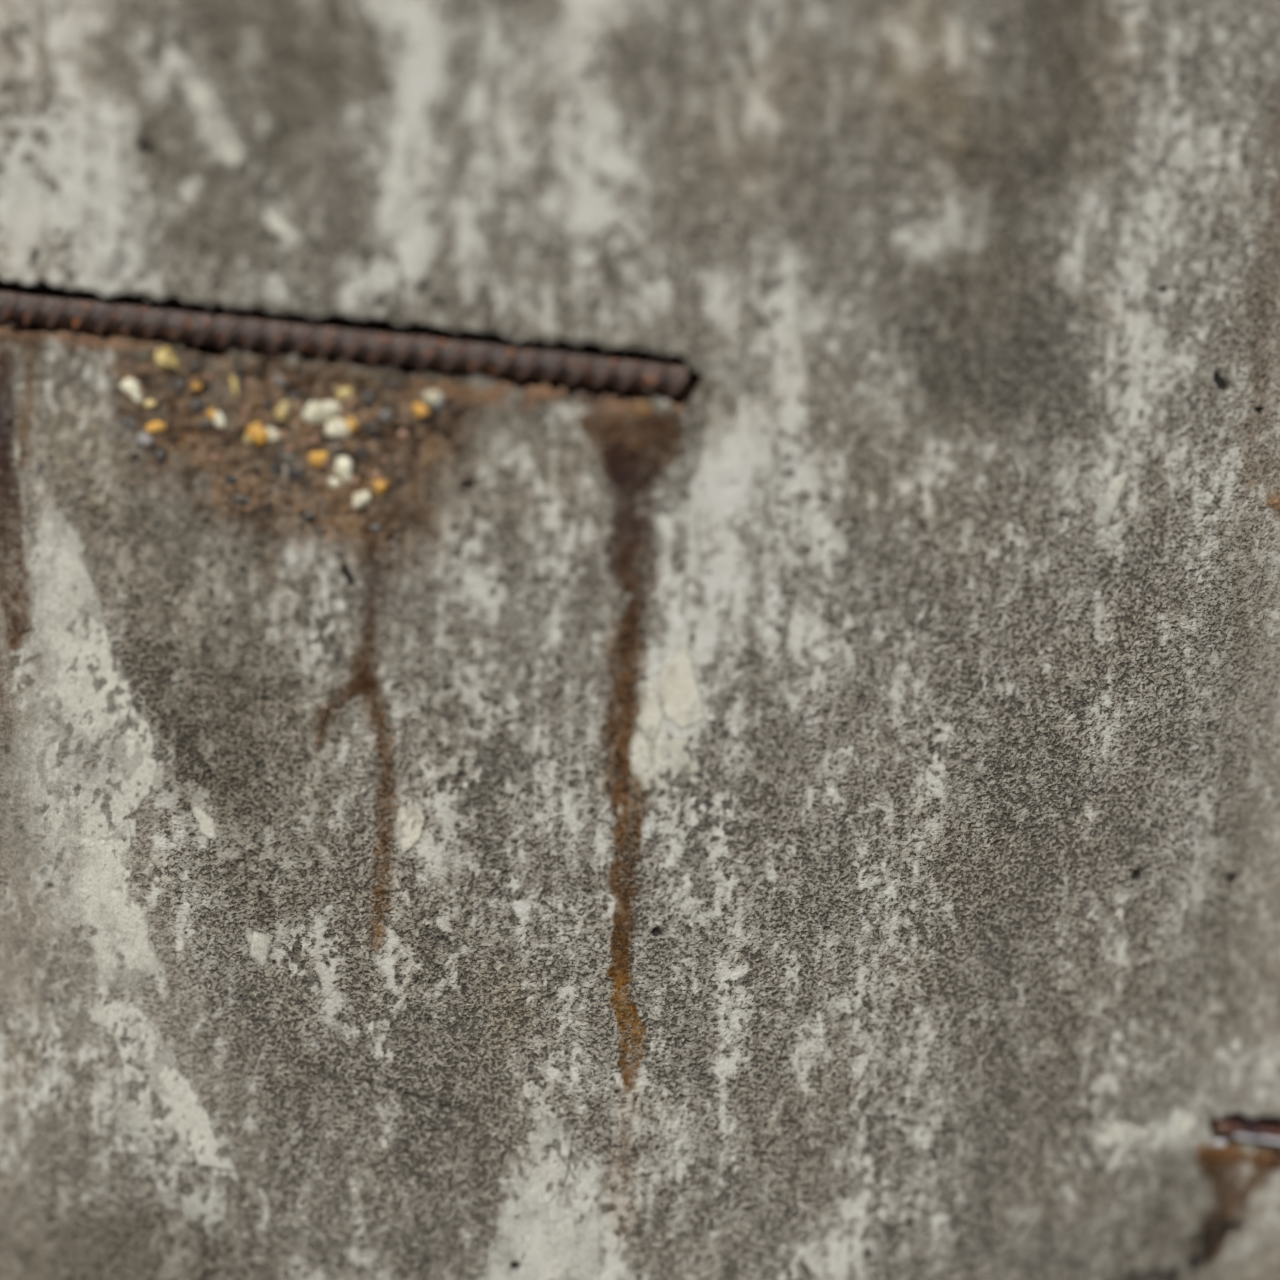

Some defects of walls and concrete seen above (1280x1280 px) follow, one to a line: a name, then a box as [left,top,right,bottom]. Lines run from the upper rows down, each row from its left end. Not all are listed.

spalling [0,279,702,547]
rust [581,411,680,1034]
peeling [1095,1122,1152,1147]
spalling [1177,1113,1280,1169]